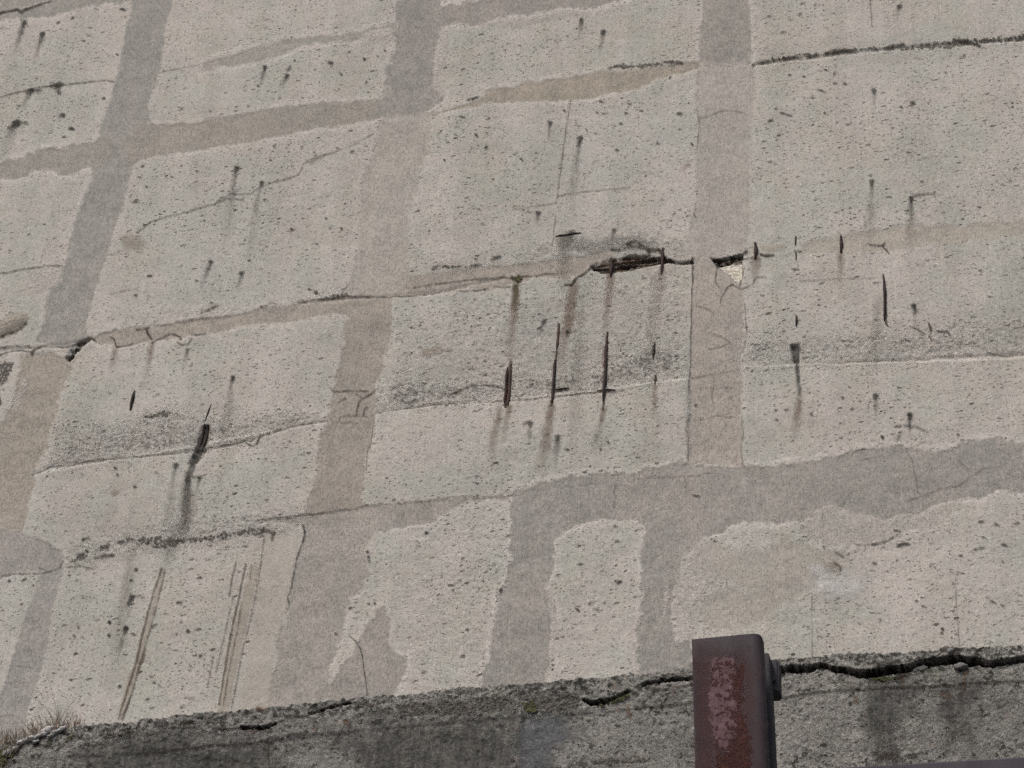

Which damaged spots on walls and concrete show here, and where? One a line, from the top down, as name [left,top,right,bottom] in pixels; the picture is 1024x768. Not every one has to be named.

spalling [555,232,669,277]
spalling [710,242,758,282]
crack [260,267,592,307]
crack [0,317,211,361]
damp [174,426,207,491]
crack [780,646,1024,683]
crack [585,676,691,706]